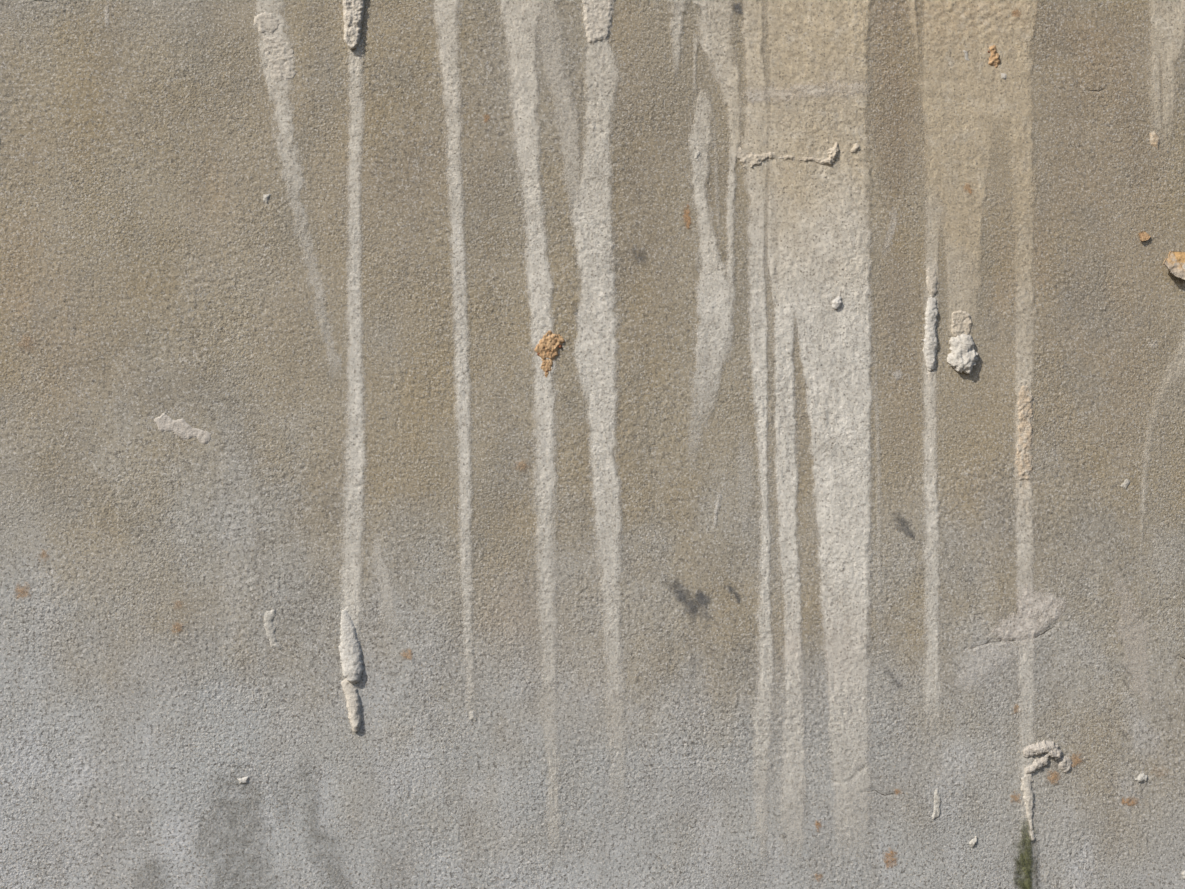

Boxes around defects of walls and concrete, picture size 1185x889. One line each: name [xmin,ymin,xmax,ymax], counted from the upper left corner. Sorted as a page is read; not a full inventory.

efflorescence [253,0,303,213]
efflorescence [338,0,366,732]
efflorescence [434,0,474,696]
efflorescence [501,0,622,825]
efflorescence [671,0,872,830]
efflorescence [907,0,1038,841]
efflorescence [1141,326,1185,530]
efflorescence [1149,0,1185,149]
flaking render [1163,251,1185,280]